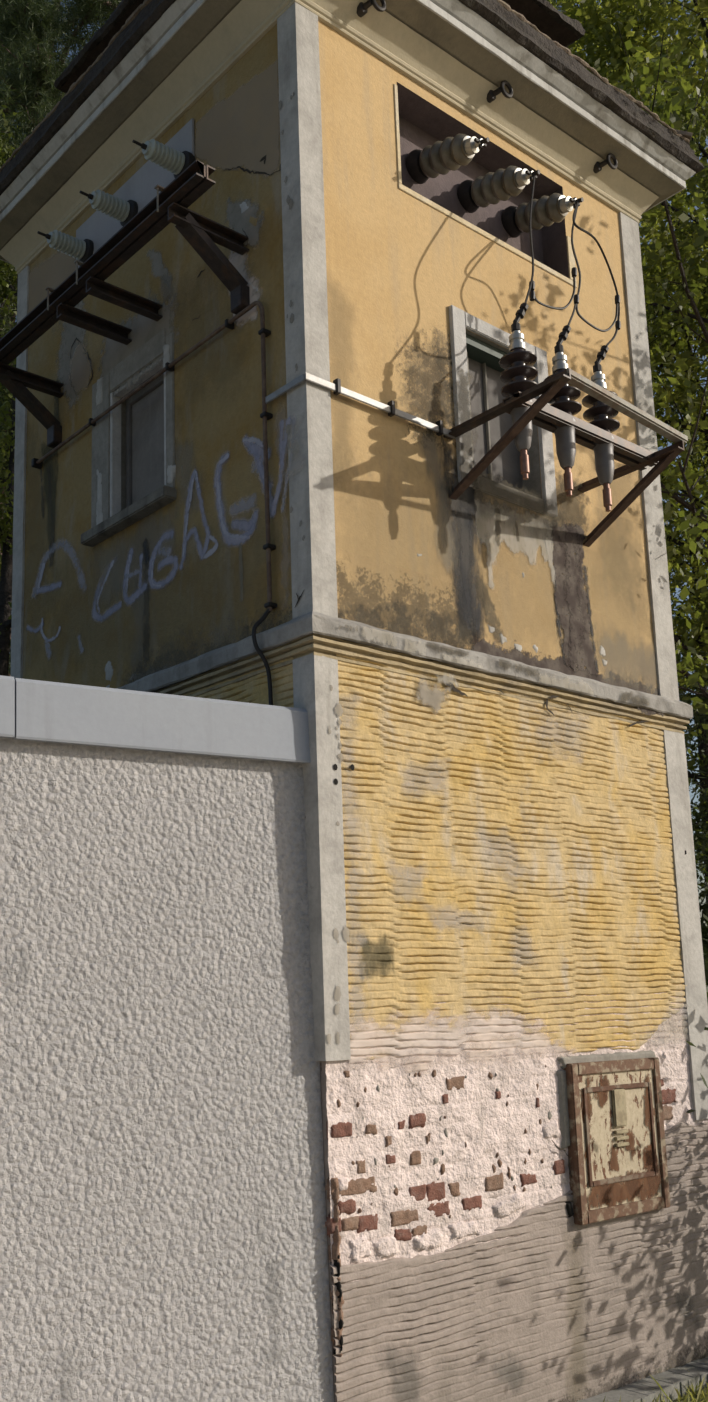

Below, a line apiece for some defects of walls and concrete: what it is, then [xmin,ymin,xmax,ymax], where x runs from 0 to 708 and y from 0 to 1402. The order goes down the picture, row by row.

damp [423,433,598,676]
peeling [475,499,555,588]
peeling [333,926,393,979]
spalling [325,986,708,1357]